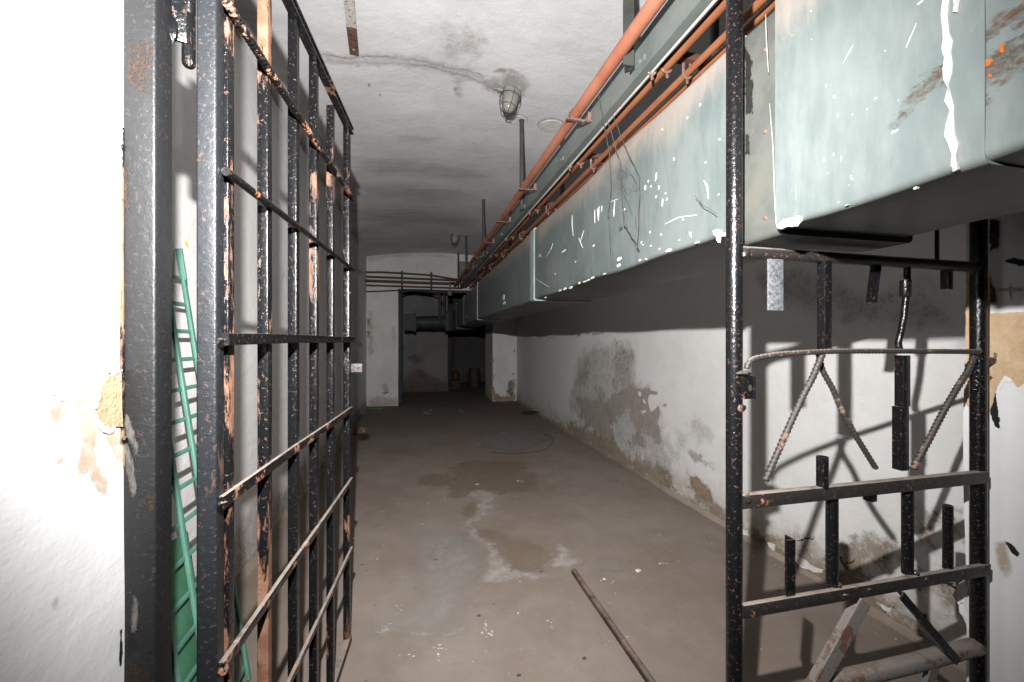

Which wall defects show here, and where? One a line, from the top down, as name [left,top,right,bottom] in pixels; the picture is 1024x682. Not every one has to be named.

rust [986,6,1024,84]
spalling [93,370,123,434]
damp [567,343,671,488]
spalling [909,272,1024,470]
damp [406,490,581,637]